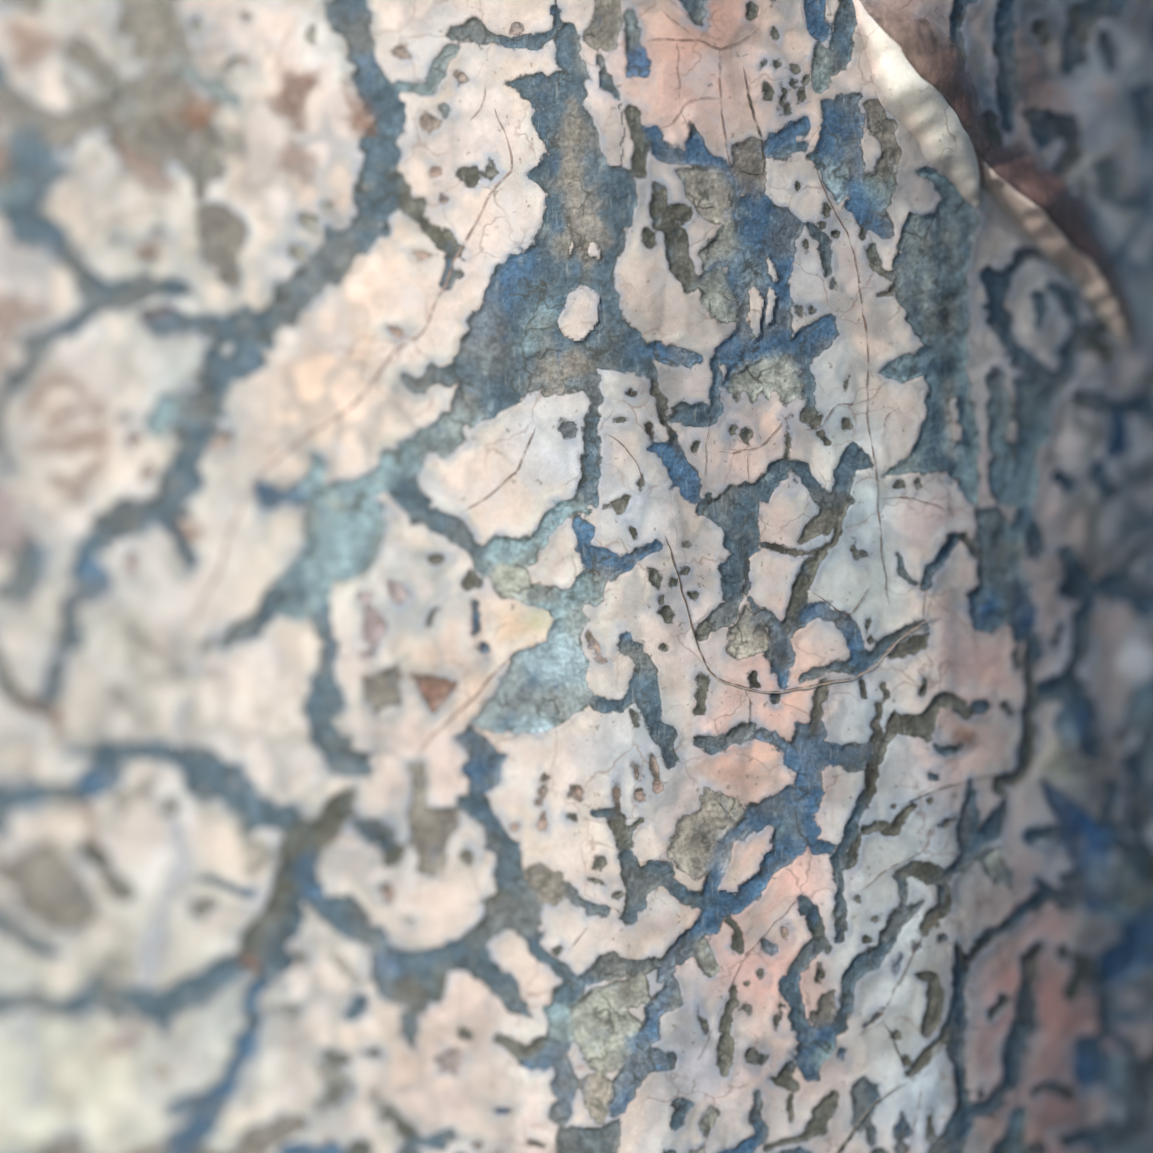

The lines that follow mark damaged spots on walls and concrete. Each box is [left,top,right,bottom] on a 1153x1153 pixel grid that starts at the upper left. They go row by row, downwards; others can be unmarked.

peeling [0,0,250,419]
peeling [583,0,623,52]
peeling [623,9,651,78]
peeling [788,0,857,104]
peeling [806,92,902,241]
peeling [980,0,1131,200]
peeling [770,166,1153,1153]
spalling [0,841,135,958]
spalling [698,968,769,1077]
crack [698,901,796,1059]
crack [835,893,952,1153]
peeling [720,1076,913,1153]